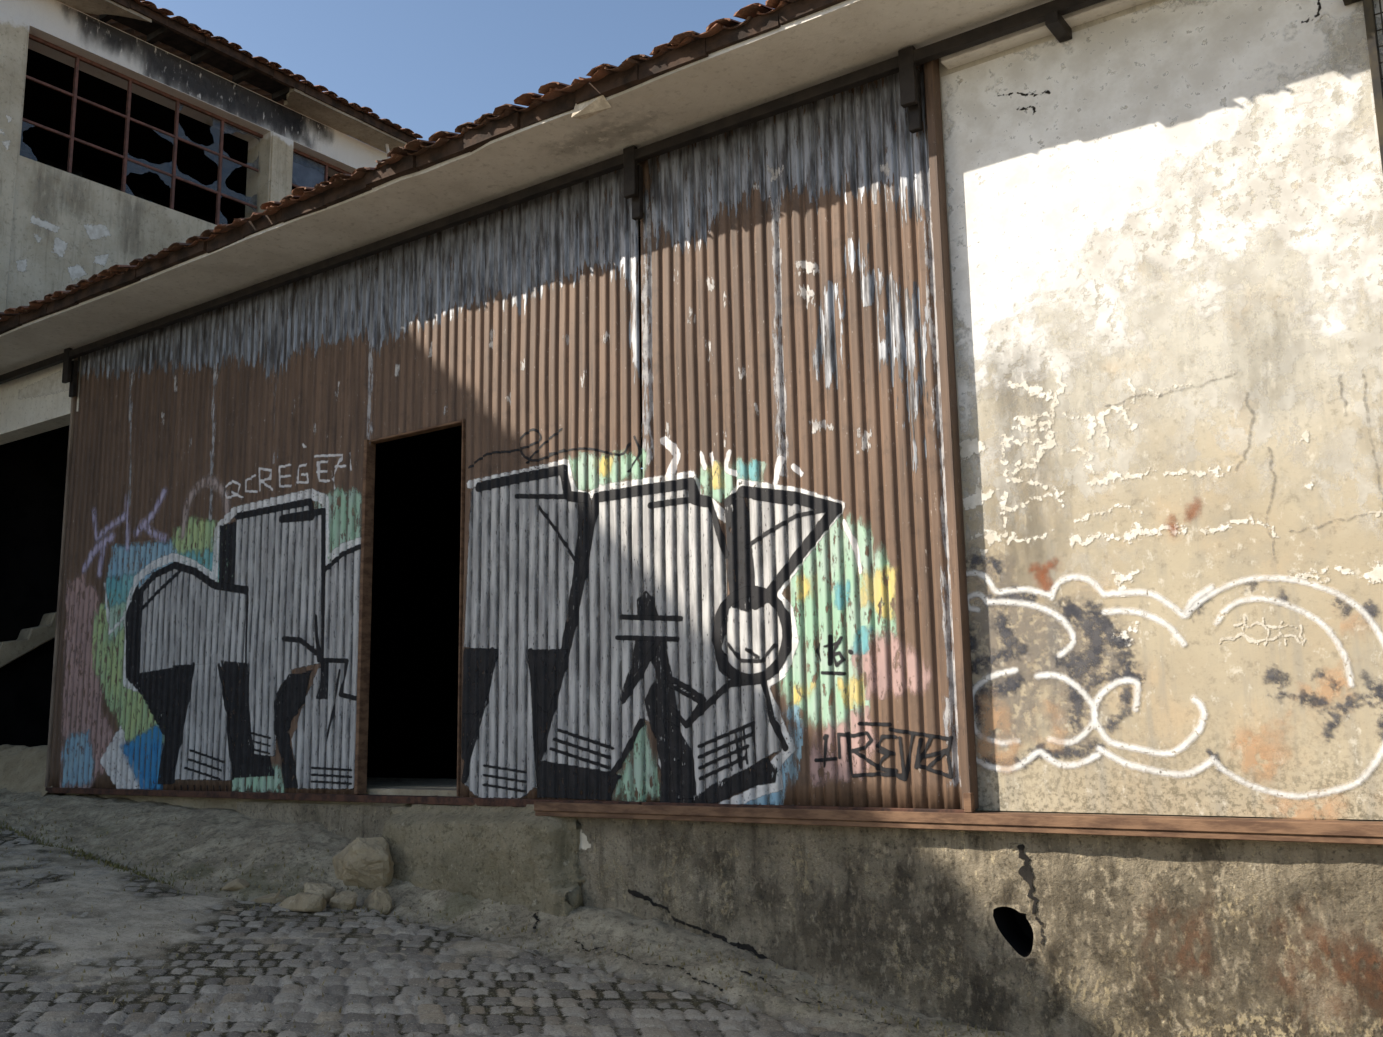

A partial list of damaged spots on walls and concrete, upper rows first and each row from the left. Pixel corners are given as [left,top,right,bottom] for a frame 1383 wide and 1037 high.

peeling [18,0,1383,786]
crack [971,367,1279,647]
crack [574,889,891,1025]
crack [1017,844,1045,953]